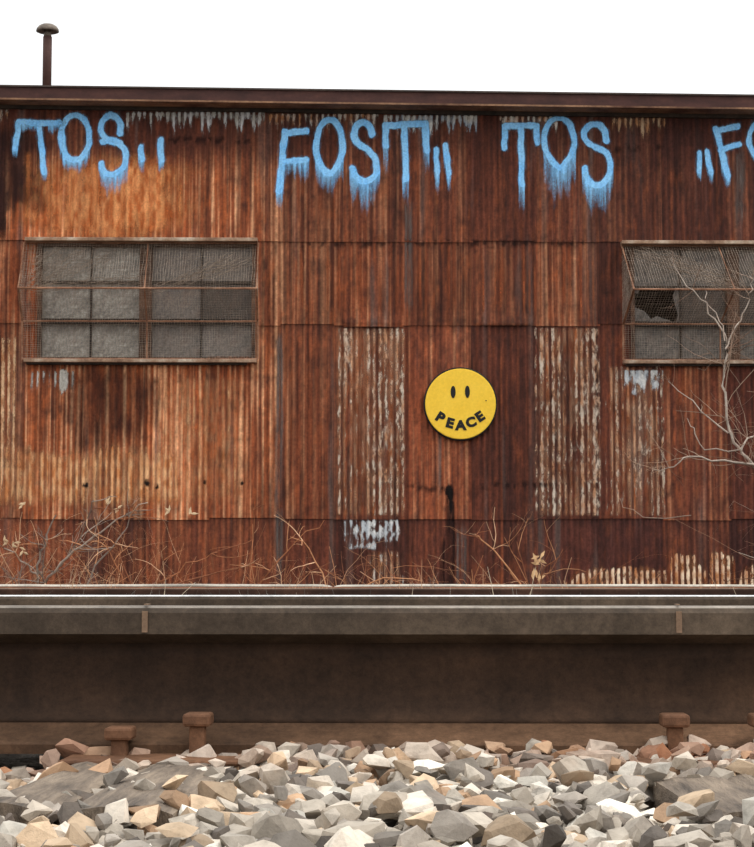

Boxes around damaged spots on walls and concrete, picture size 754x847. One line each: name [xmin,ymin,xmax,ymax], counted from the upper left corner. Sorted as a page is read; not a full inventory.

corrosion [25,154,182,237]
corrosion [0,385,206,503]
peeling [337,328,405,584]
peeling [535,328,601,516]
peeling [610,367,665,516]
peeling [566,552,754,585]